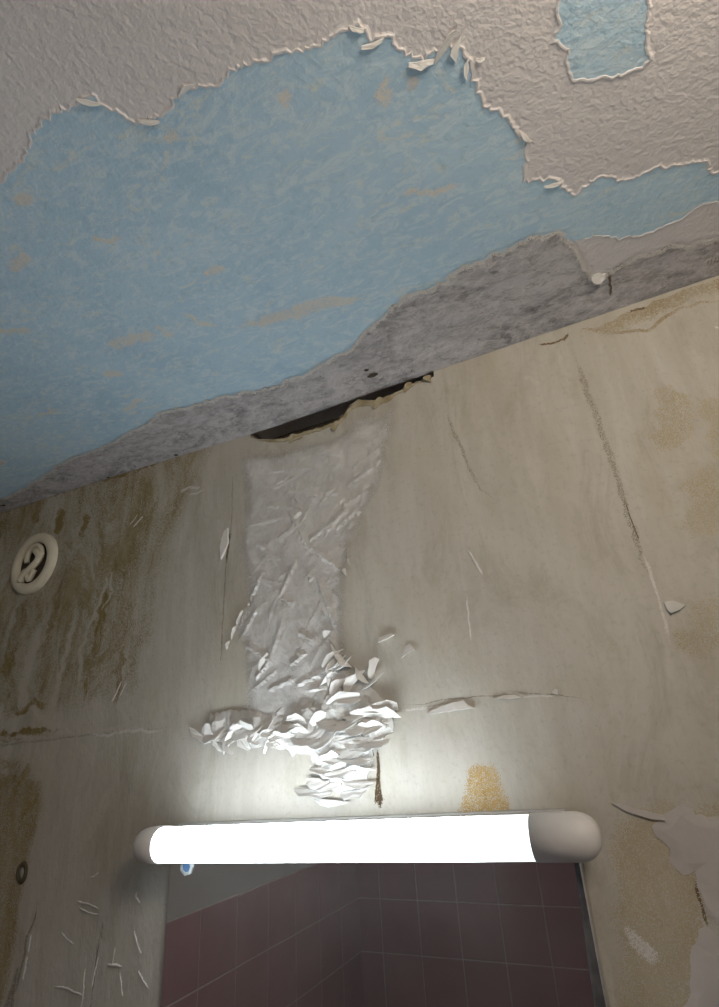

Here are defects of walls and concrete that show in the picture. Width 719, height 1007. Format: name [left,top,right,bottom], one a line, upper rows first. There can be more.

peeling [549,0,654,84]
peeling [0,18,719,513]
spalling [21,544,47,583]
damp [0,445,218,743]
spalling [189,408,402,808]
crack [572,353,671,644]
damp [0,756,44,1006]
rust [458,762,510,812]